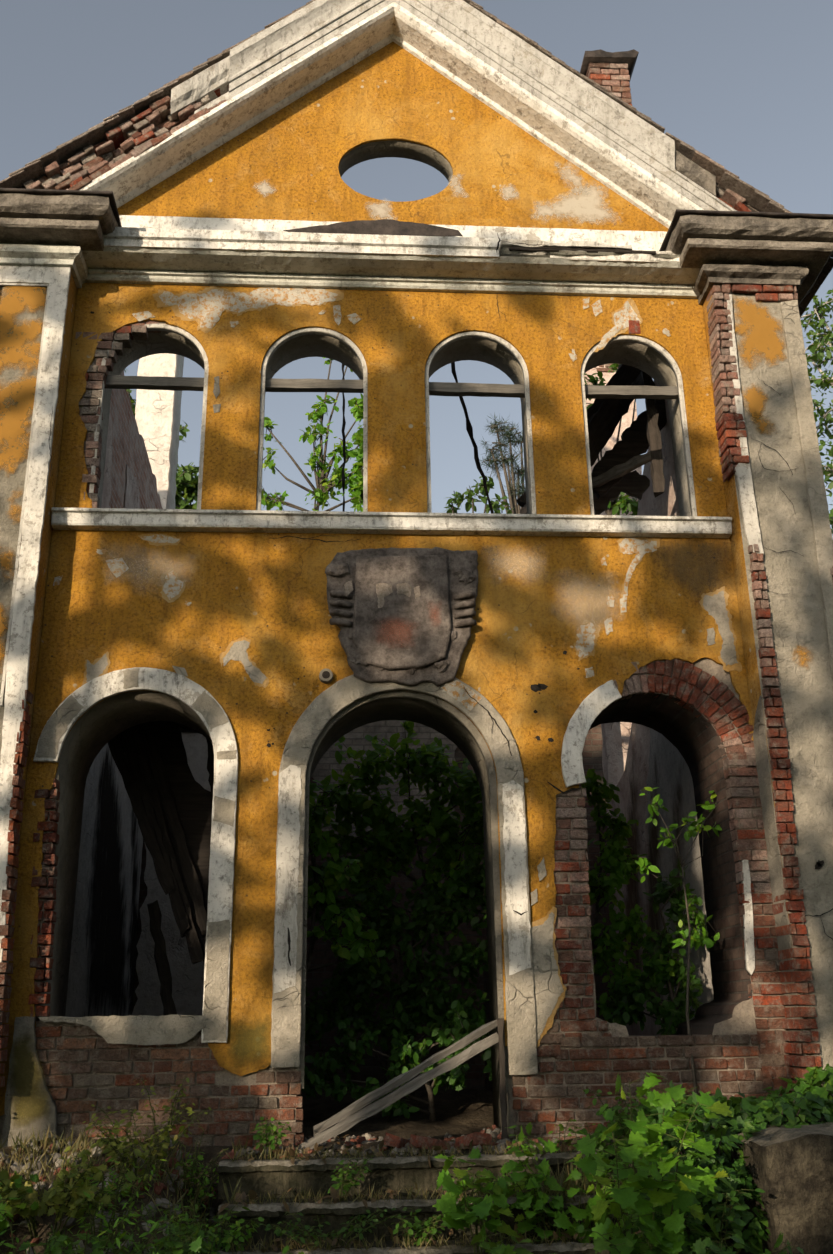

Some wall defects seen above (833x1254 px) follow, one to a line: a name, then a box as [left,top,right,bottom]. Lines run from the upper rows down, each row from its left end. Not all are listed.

peeling [534,165,611,221]
peeling [75,286,363,508]
flaking render [706,284,798,482]
peeling [96,549,129,578]
peeling [138,533,181,546]
peeling [160,568,192,606]
peeling [82,651,111,685]
peeling [123,668,140,689]
peeling [220,636,269,688]
peeling [442,679,482,711]
flaking render [502,537,824,1144]
flaking render [0,690,304,1147]